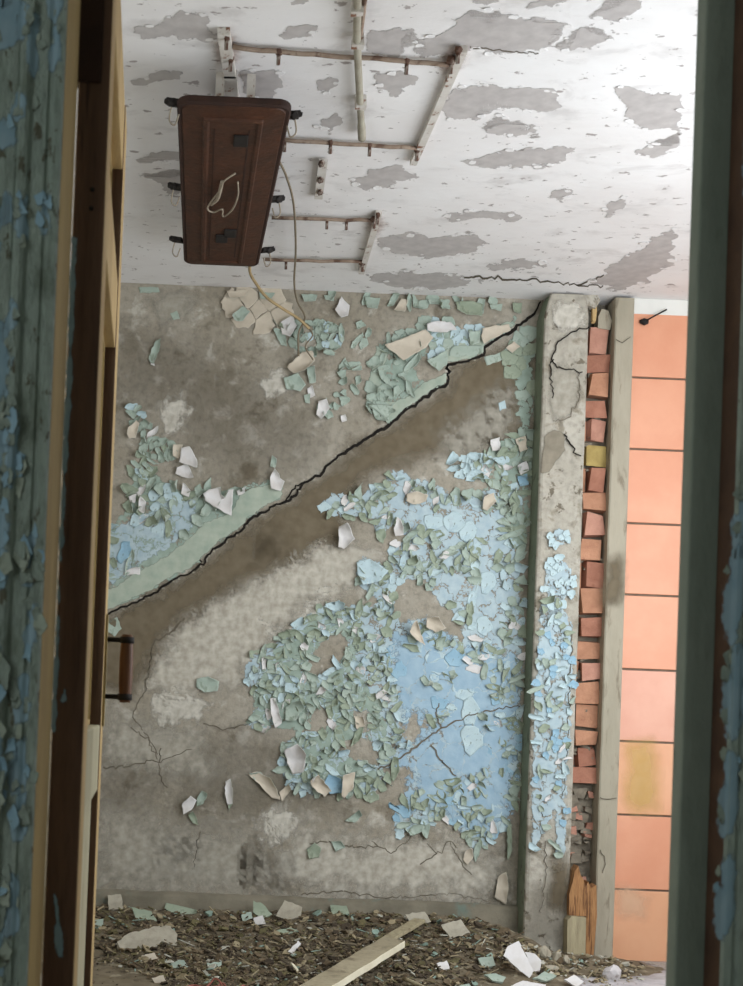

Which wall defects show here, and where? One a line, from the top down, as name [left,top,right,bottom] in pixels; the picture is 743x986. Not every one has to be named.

peeling [133,10,218,43]
peeling [366,0,642,58]
peeling [441,83,575,170]
peeling [615,85,687,158]
peeling [349,159,419,191]
peeling [377,209,522,260]
peeling [587,228,678,292]
crack [108,275,604,615]
peeling [0,298,48,842]
peeling [108,403,285,636]
peeling [221,258,579,865]
peeling [717,481,743,838]